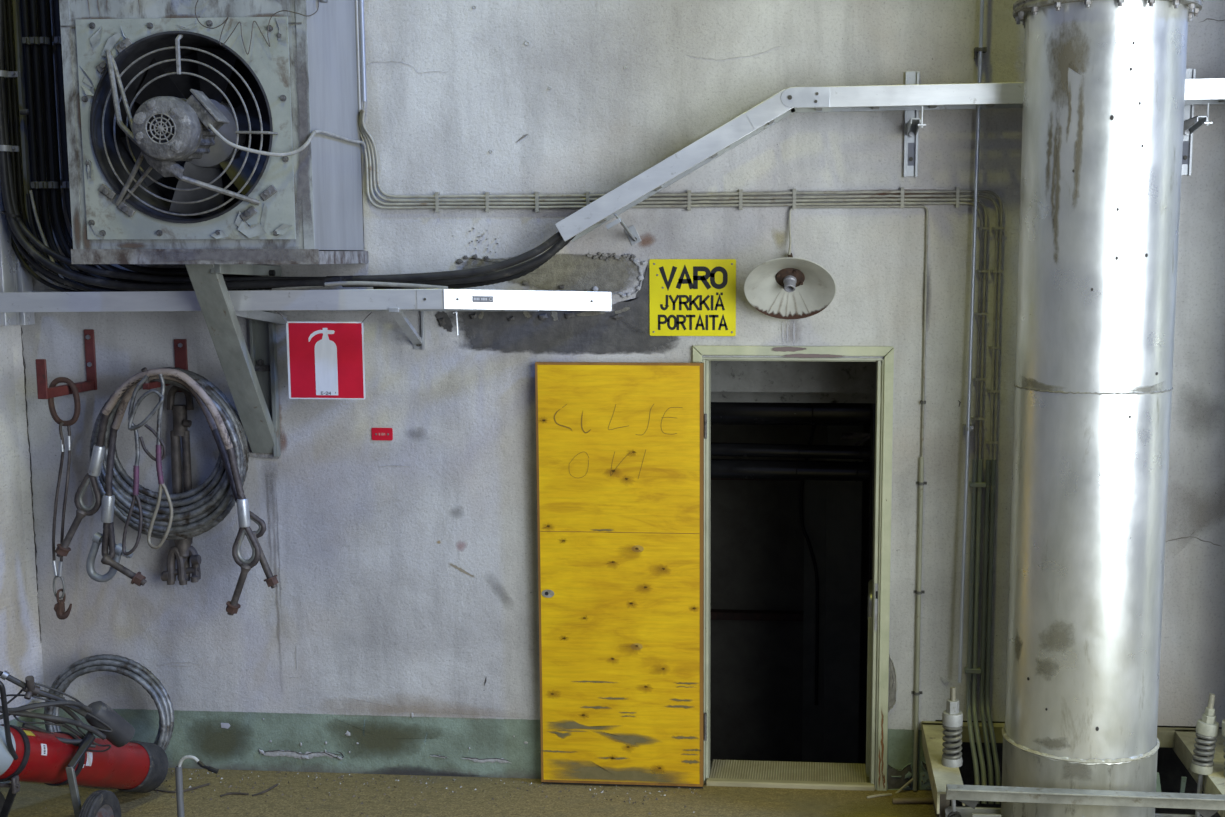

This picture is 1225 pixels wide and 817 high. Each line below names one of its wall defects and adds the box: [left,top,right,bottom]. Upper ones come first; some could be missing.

spalling [456,252,646,298]